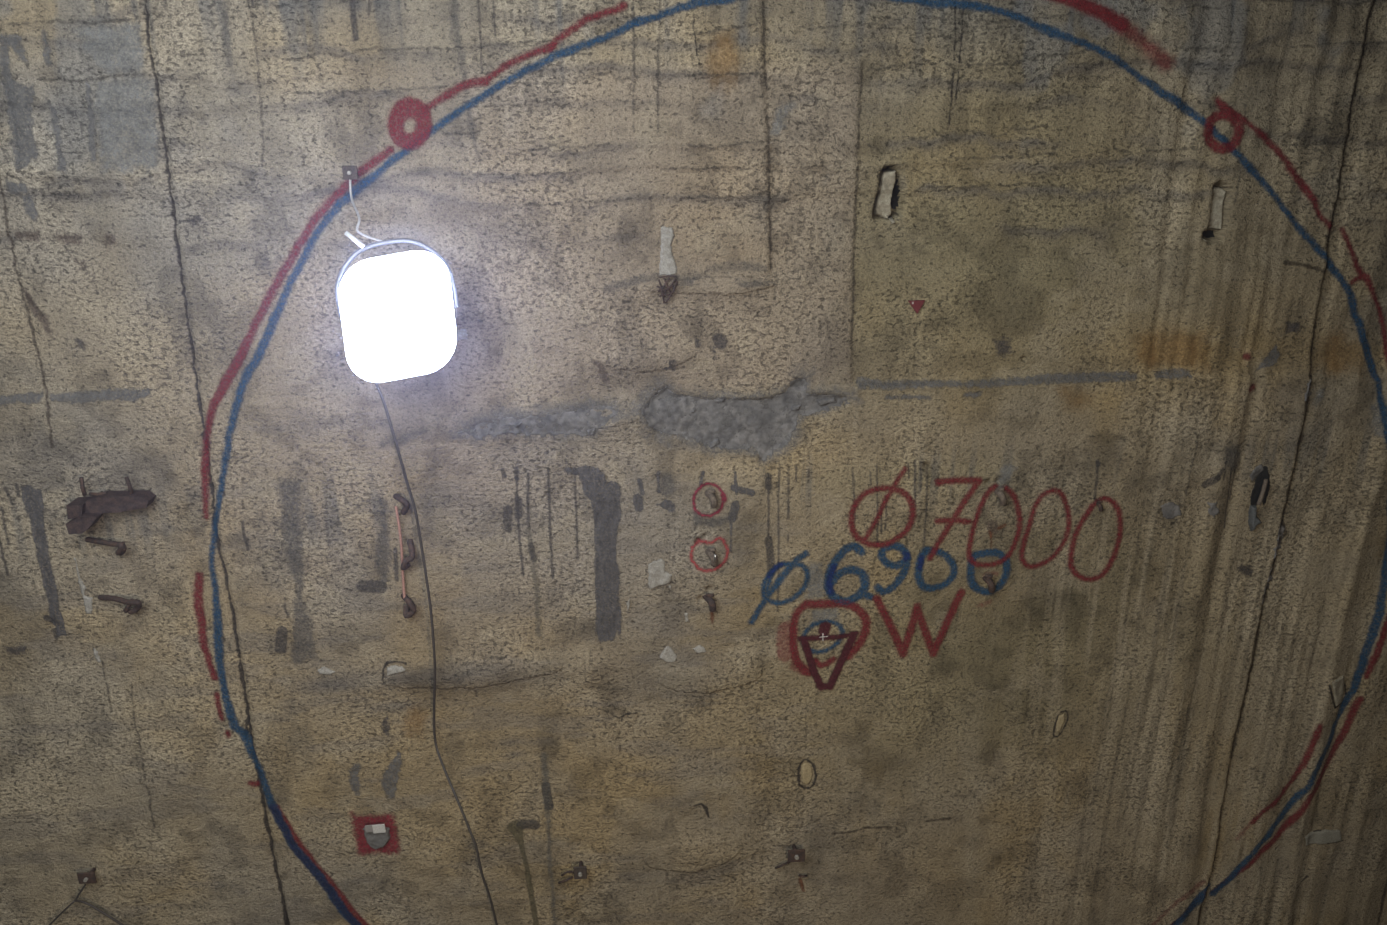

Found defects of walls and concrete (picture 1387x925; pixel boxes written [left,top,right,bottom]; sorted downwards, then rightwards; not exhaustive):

crack [1188,0,1384,273]
crack [25,0,290,925]
crack [1198,323,1316,924]